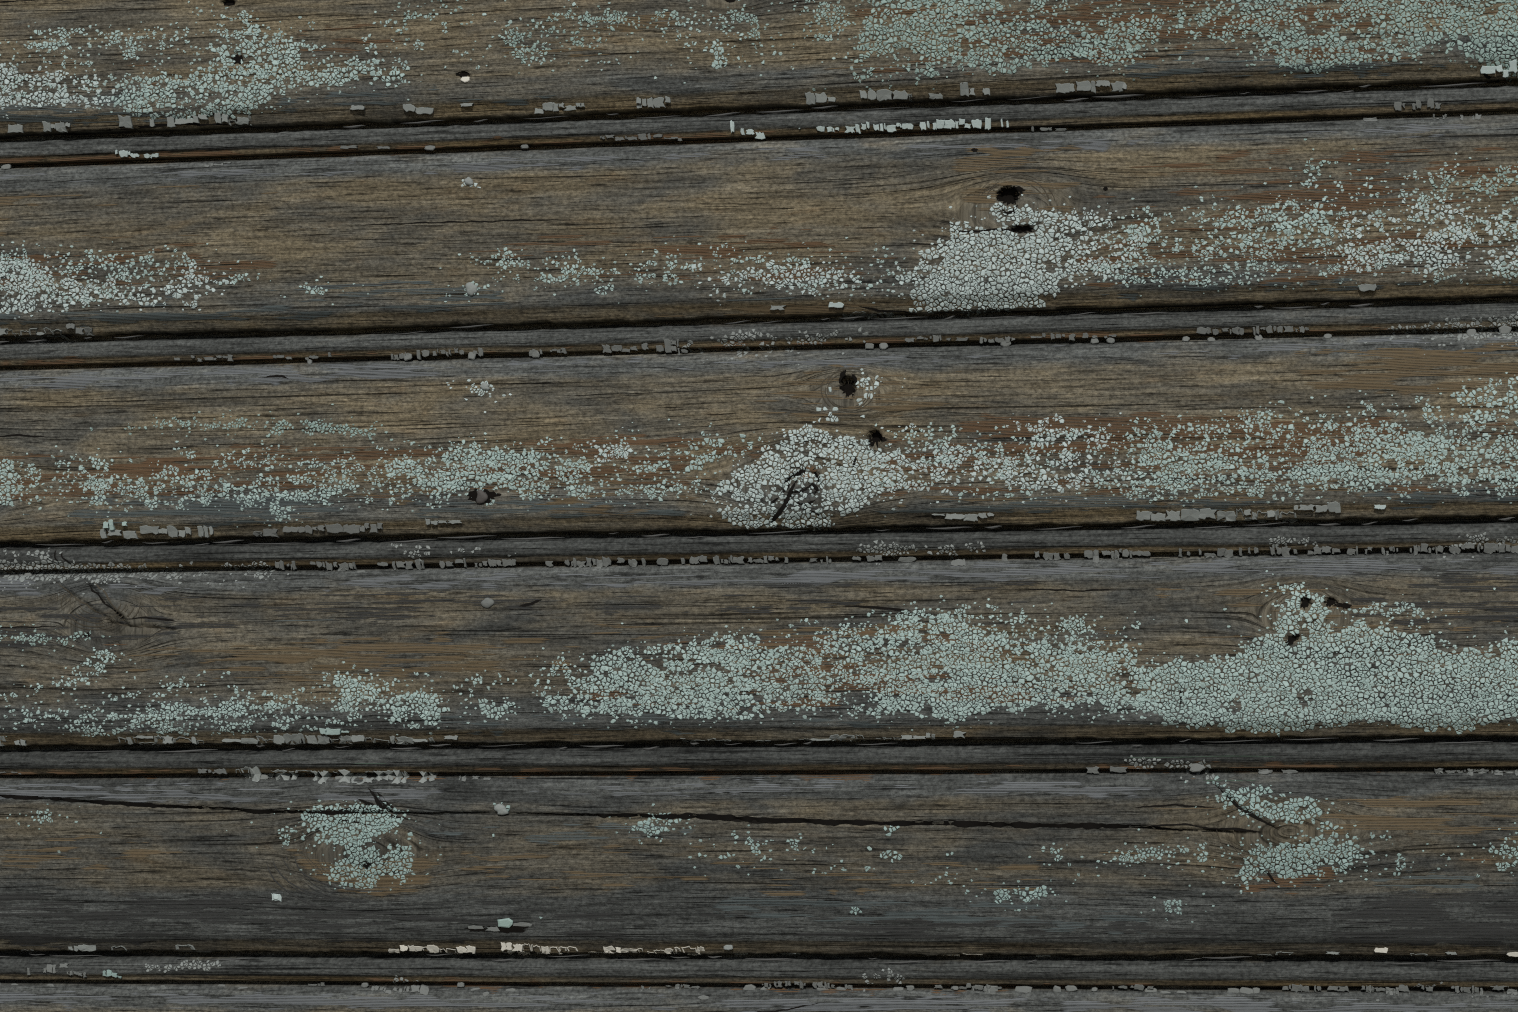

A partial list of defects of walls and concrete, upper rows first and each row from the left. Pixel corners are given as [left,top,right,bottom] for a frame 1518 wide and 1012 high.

peeling [0,0,1518,134]
peeling [115,150,159,158]
peeling [730,120,765,140]
peeling [439,139,1518,366]
crack [0,550,177,637]
peeling [0,369,1518,746]
peeling [198,766,442,893]
peeling [609,804,847,876]
peeling [865,825,903,872]
peeling [911,755,1518,923]
peeling [388,917,705,955]
peeling [1282,982,1518,1001]